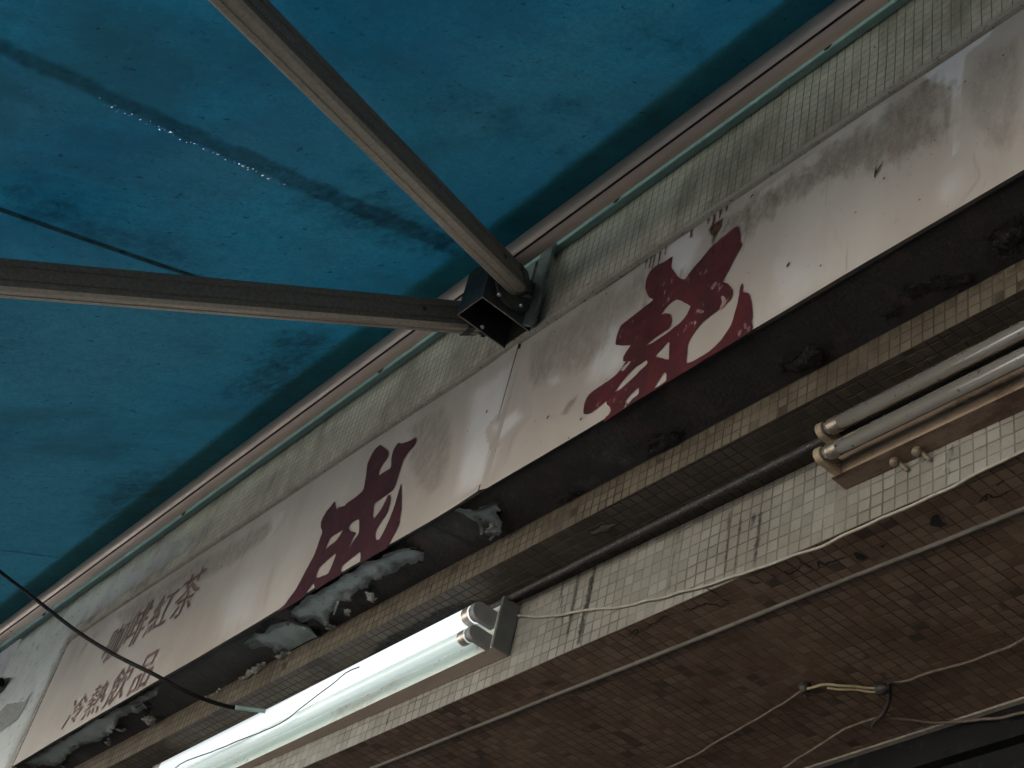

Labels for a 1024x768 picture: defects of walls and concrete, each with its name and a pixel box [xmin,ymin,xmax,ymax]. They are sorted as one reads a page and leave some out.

peeling [454,501,503,541]
peeling [238,547,425,680]
water stain [561,567,596,644]